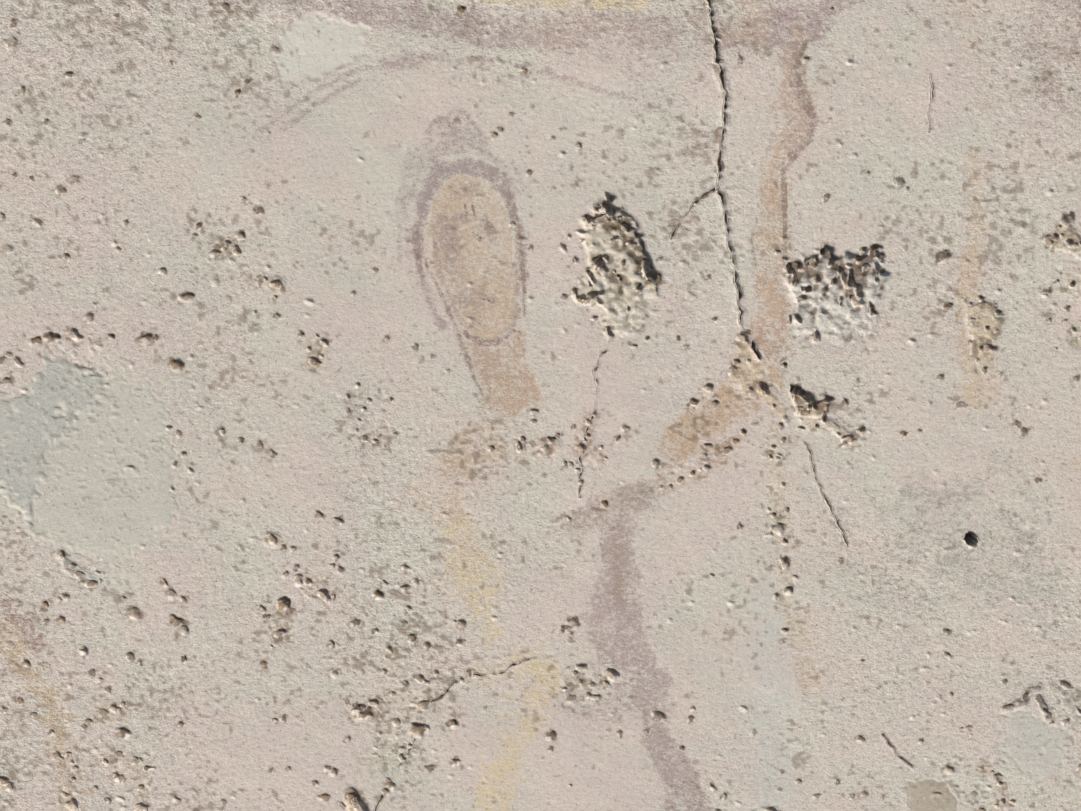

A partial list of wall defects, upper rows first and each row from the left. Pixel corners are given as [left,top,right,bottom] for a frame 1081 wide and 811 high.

crack [667,0,761,359]
flaking render [559,193,665,347]
flaking render [774,243,891,351]